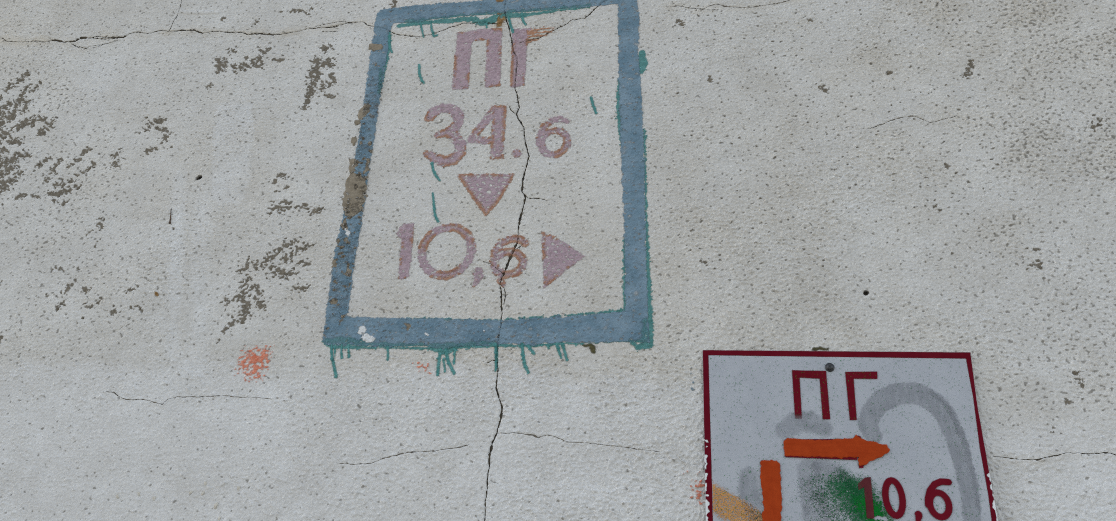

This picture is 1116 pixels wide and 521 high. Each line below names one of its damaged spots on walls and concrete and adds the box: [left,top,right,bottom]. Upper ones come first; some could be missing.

crack [670,0,789,10]
peeling [0,70,96,206]
crack [2,0,659,521]
crack [994,452,1116,461]